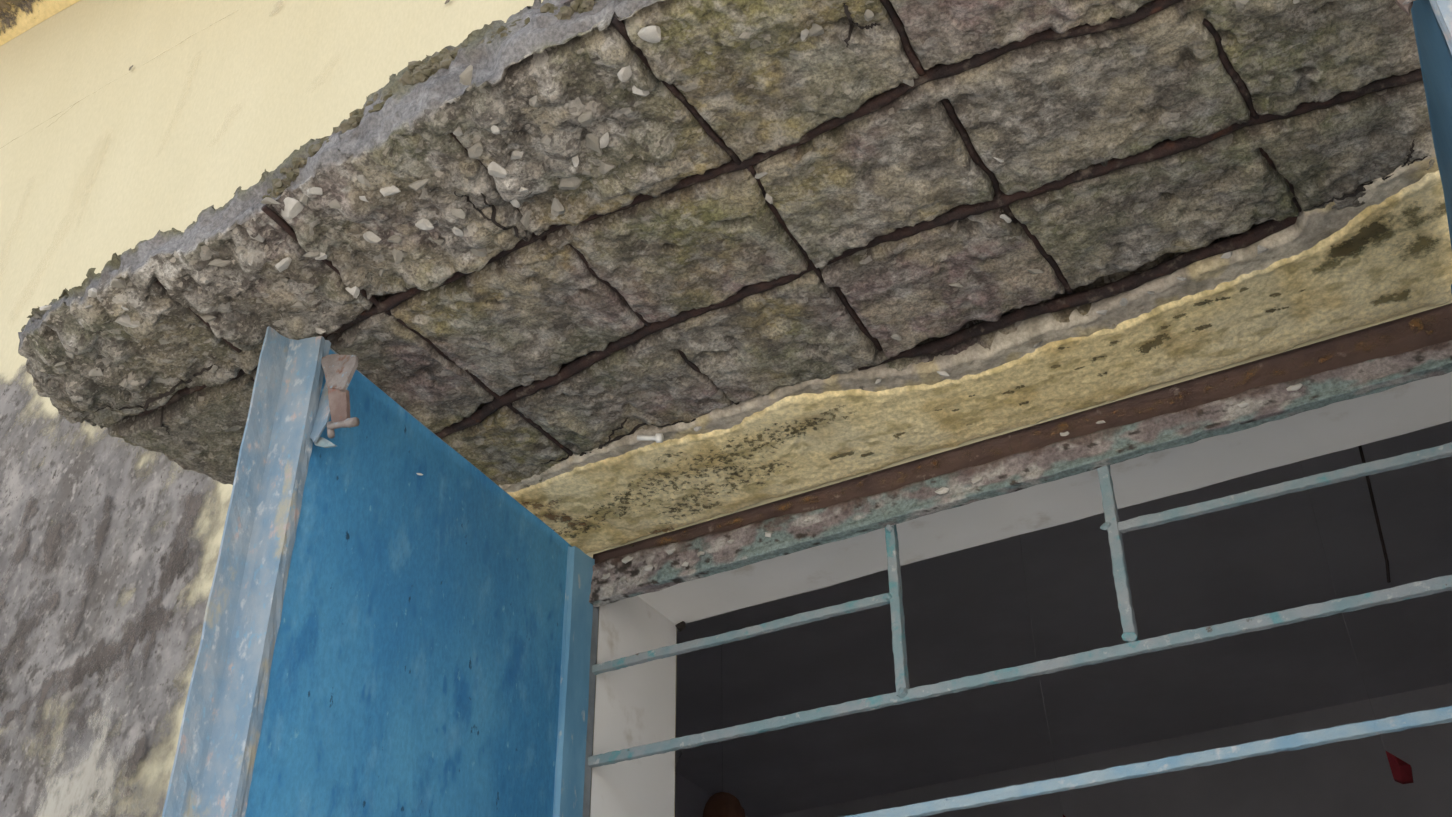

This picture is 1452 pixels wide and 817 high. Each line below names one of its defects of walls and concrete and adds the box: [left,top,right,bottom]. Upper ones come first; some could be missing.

water stain [0,0,40,33]
spalling [18,0,1439,493]
water stain [1299,203,1446,292]
water stain [1051,287,1249,376]
water stain [1373,289,1410,306]
water stain [554,405,857,538]
water stain [829,451,874,460]
peeling [601,556,653,582]